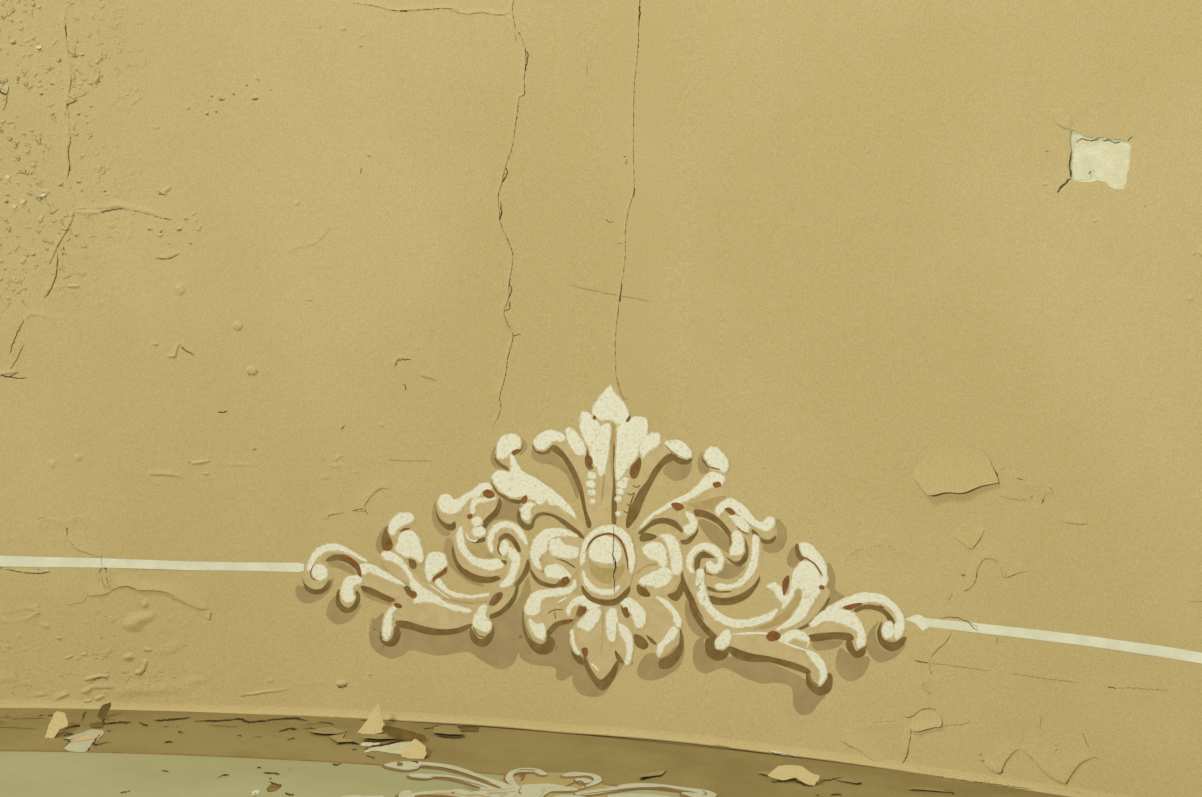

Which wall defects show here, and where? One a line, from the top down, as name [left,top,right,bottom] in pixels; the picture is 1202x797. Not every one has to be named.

spalling [1050,80,1132,193]
crack [353,0,529,427]
crack [576,0,653,400]
spalling [45,702,128,752]
peeling [279,704,479,764]
crack [897,708,969,762]